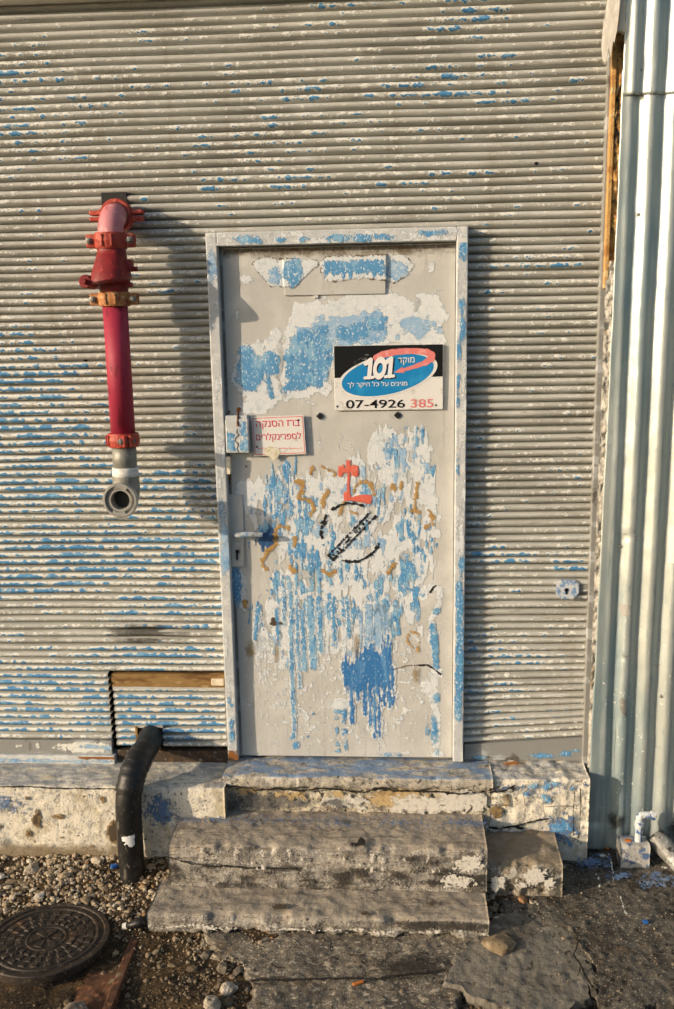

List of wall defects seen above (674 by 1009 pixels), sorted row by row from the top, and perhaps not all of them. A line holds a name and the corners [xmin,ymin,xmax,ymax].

peeling [0,0,628,765]
peeling [0,790,105,837]
flaking render [106,820,117,844]
peeling [142,792,180,829]
flaking render [238,788,307,802]
crack [226,785,582,842]
flaking render [318,781,592,847]
crack [169,857,301,871]